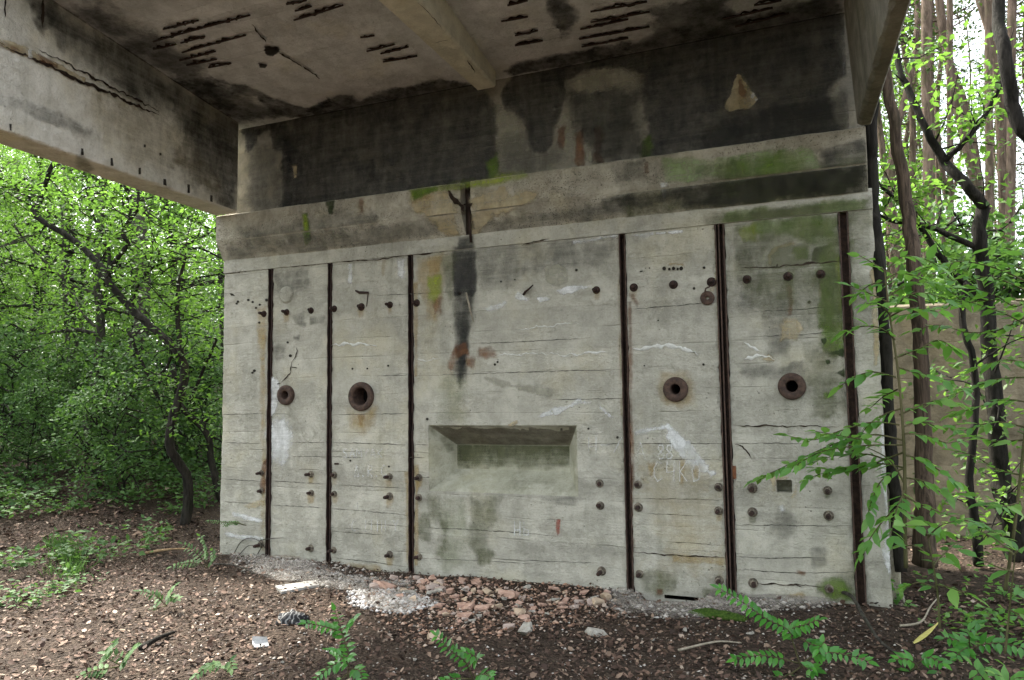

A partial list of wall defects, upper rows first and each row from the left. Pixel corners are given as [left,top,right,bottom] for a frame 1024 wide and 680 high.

crack [0,0,159,115]
damp [32,0,845,207]
spalling [726,74,758,111]
damp [542,140,866,223]
damp [445,238,476,384]
damp [646,424,715,476]